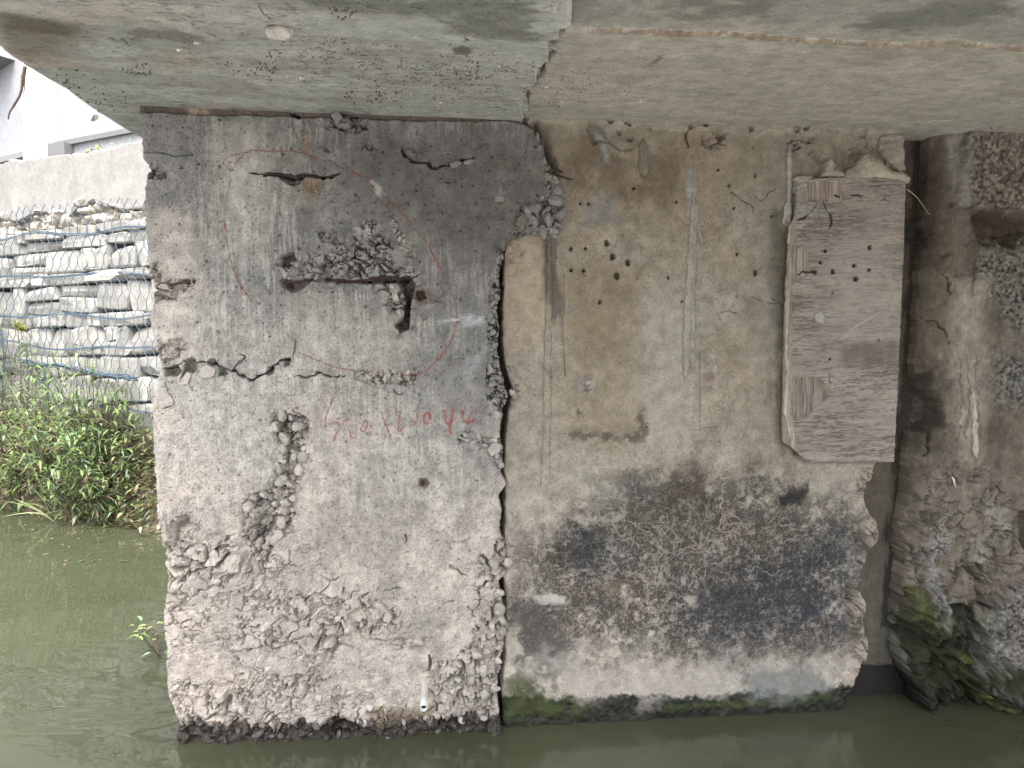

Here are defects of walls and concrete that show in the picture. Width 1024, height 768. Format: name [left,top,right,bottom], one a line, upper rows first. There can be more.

crack [524,20,1024,117]
crack [250,171,341,186]
crack [402,143,487,170]
spalling [277,213,425,338]
spalling [486,129,573,411]
crack [165,341,346,408]
spalling [456,429,505,468]
spalling [169,514,193,546]
spalling [889,456,1024,595]
leakage [510,467,856,702]
spalling [385,636,433,666]
spalling [169,673,465,729]